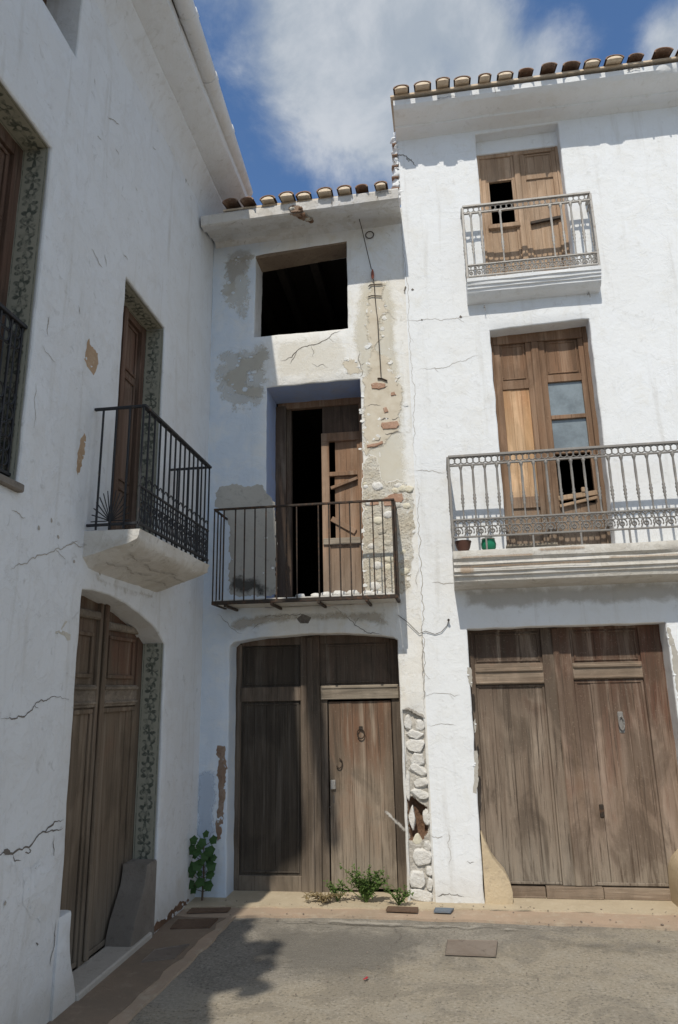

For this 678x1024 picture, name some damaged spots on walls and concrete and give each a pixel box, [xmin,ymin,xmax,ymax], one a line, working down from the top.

peeling [83,338,99,376]
peeling [217,348,270,398]
crack [283,332,337,367]
peeling [343,281,408,455]
peeling [76,433,86,476]
crack [385,211,476,726]
crack [12,541,84,569]
crack [1,696,66,720]
spalling [402,709,434,902]
crack [0,820,64,862]